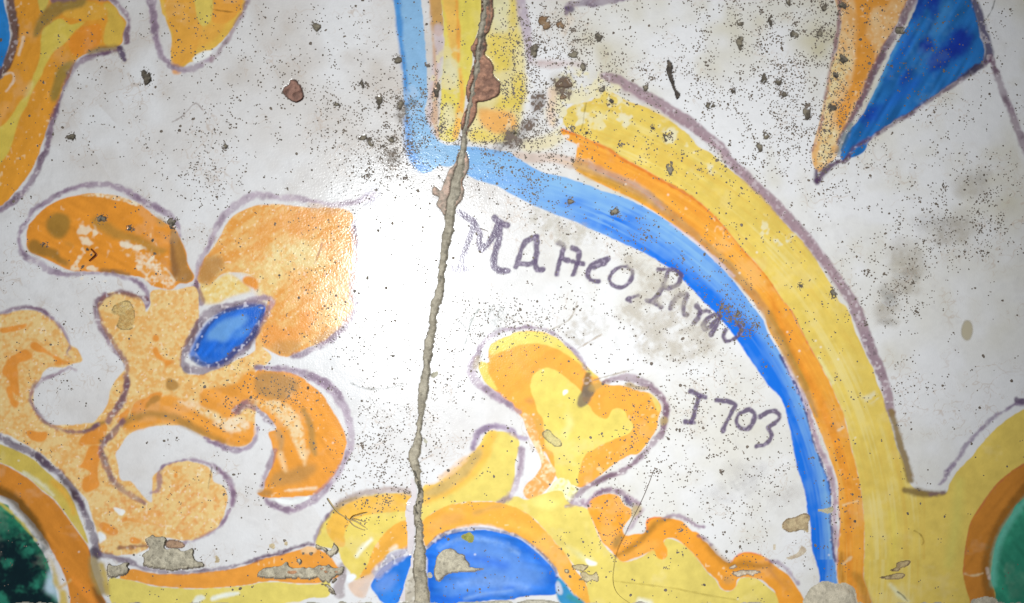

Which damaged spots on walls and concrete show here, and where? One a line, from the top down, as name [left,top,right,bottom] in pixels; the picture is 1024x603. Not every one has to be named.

crack [409,0,489,603]